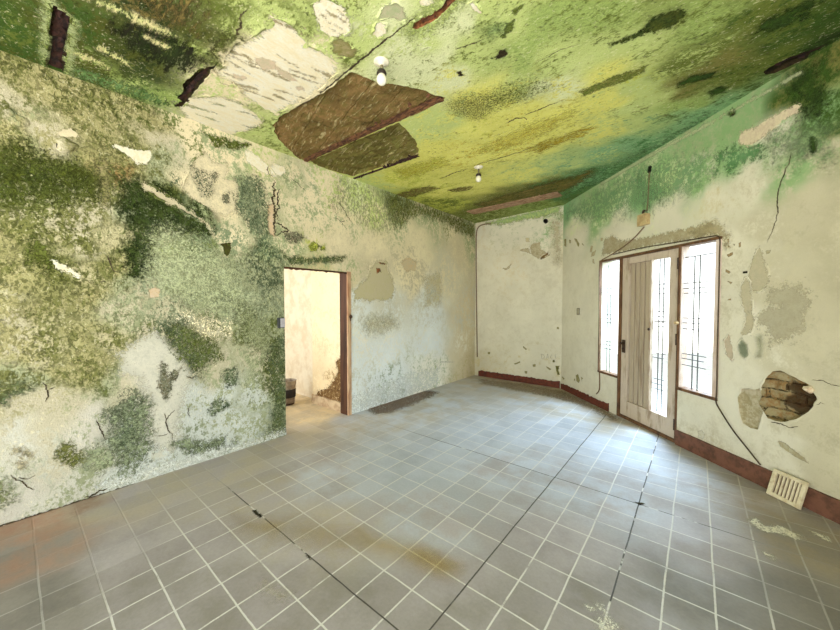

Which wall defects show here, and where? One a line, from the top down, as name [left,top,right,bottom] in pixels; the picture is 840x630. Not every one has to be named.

leakage [38,0,210,107]
leakage [200,130,252,151]
crack [267,167,305,236]
peeling [170,0,456,162]
leakage [609,5,688,48]
leakage [474,60,830,258]
peeling [735,101,802,148]
crack [767,155,791,242]
leakage [0,139,287,493]
peeling [352,260,396,302]
peeling [723,245,811,362]
spalling [737,368,822,432]